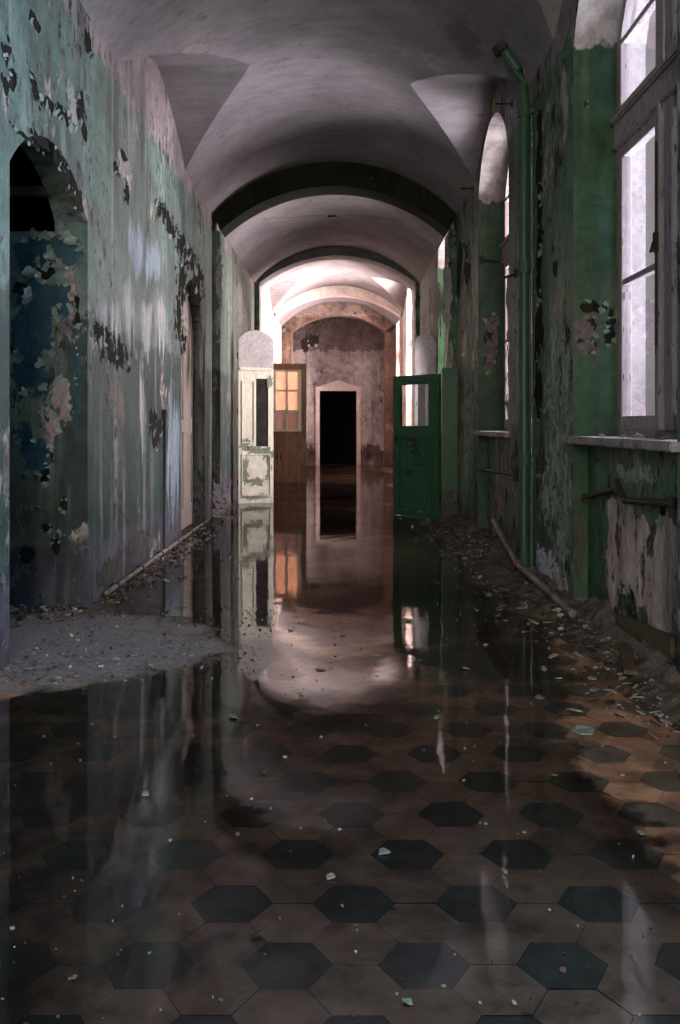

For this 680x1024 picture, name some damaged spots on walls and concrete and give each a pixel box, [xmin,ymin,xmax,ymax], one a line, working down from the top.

peeling [29,9,43,35]
peeling [0,34,90,142]
peeling [84,22,94,59]
flaking render [113,148,133,206]
peeling [156,198,223,358]
peeling [10,227,132,488]
flaking render [482,300,501,376]
peeling [531,109,617,591]
peeling [212,438,274,517]
flaking render [601,496,677,634]